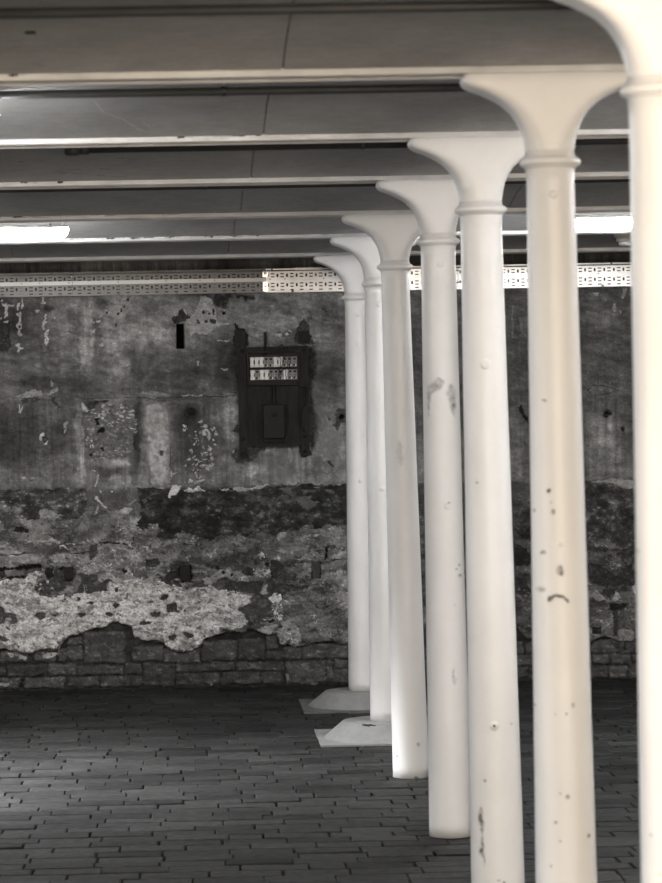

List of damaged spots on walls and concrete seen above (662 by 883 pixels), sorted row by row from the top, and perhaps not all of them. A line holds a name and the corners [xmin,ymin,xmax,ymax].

peeling [0,298,24,353]
peeling [35,297,56,346]
peeling [172,296,249,349]
leakage [145,403,169,485]
peeling [584,478,636,552]
peeling [0,400,349,692]
spalling [513,544,532,566]
spalling [514,577,531,608]
flaking render [587,563,638,680]
flaking render [516,628,533,681]